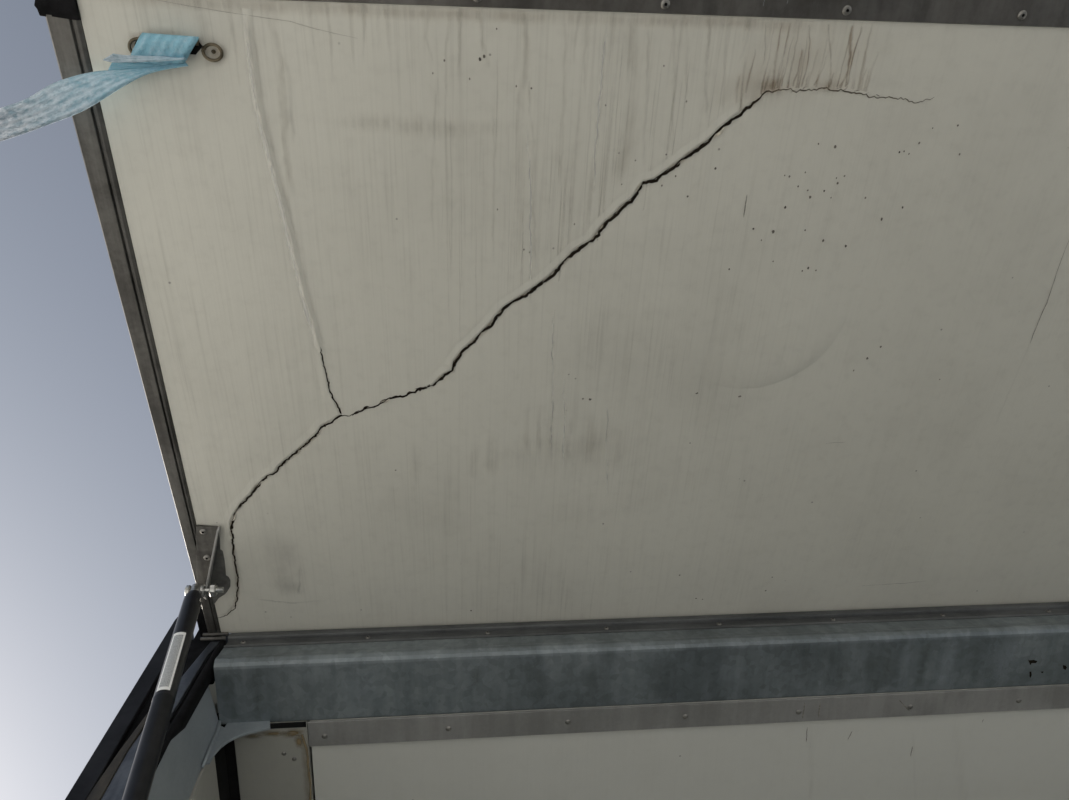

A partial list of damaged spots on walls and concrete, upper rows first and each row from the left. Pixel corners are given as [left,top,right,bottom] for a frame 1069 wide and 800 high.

crack [219,86,934,618]